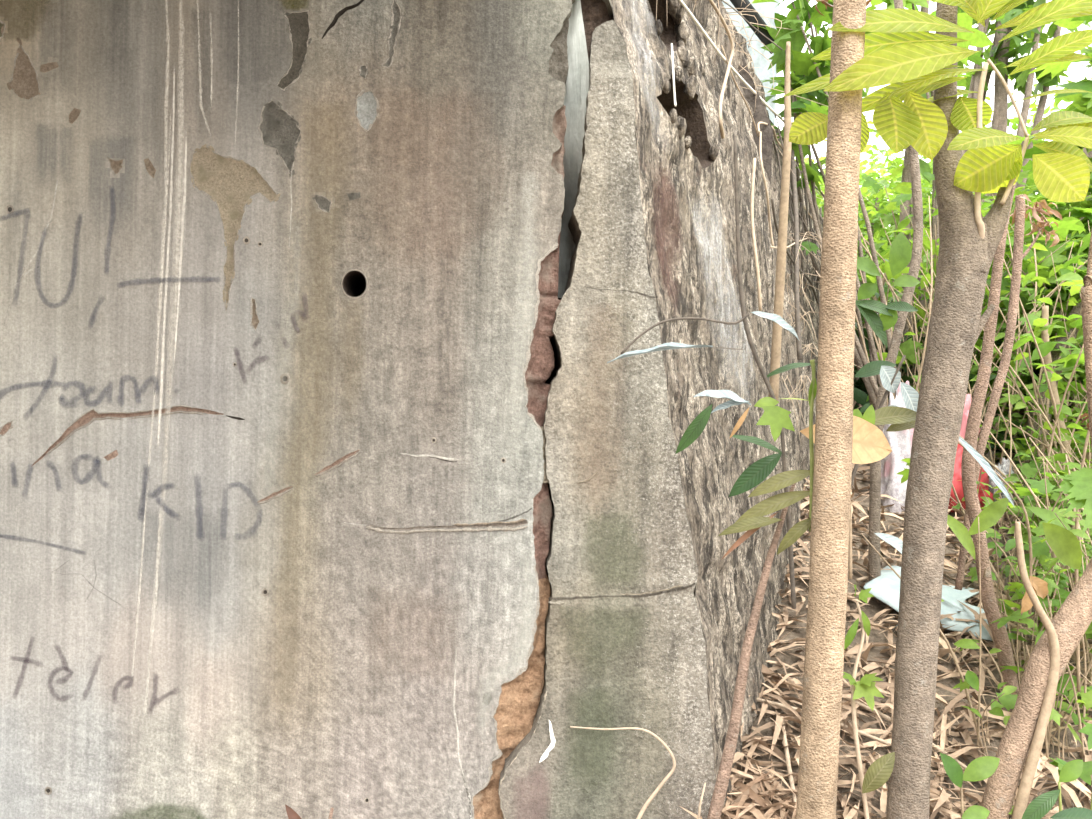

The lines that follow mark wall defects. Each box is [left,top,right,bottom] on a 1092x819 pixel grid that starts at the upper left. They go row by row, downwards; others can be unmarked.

spalling [0,20,59,100]
spalling [258,10,312,177]
crack [322,0,364,39]
spalling [648,0,719,169]
peeling [190,144,280,310]
crack [31,405,245,467]
crack [344,0,695,819]